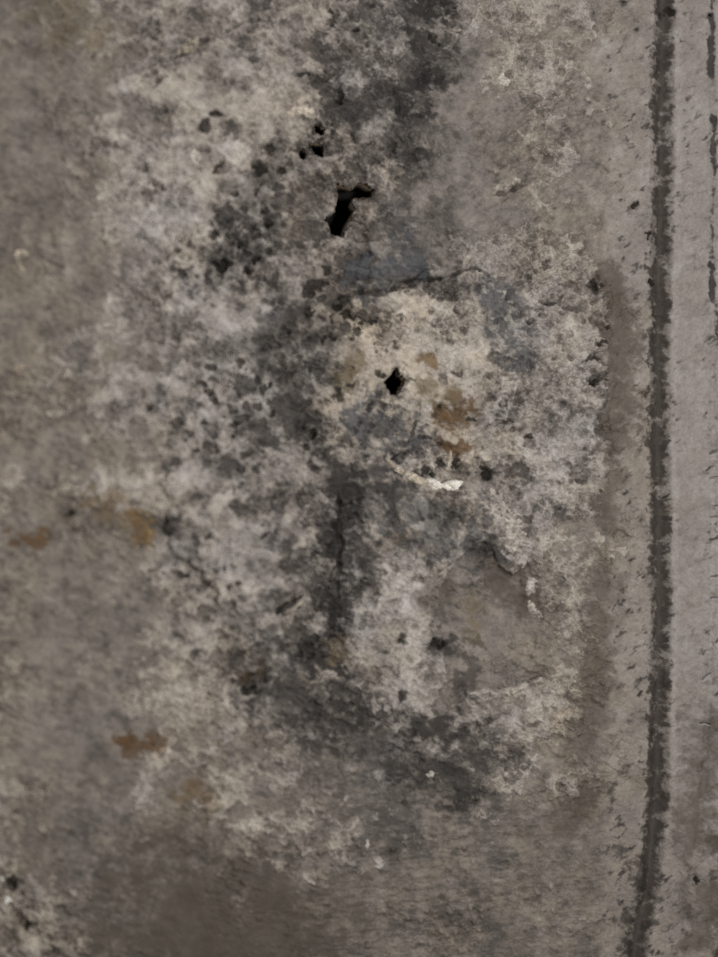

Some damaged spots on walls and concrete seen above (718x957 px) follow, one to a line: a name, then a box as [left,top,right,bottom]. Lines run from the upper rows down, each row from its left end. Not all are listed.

leakage [327,0,462,132]
peeling [189,149,202,164]
peeling [493,177,522,190]
leakage [710,114,718,176]
leakage [708,209,718,336]
leakage [590,262,644,454]
rust [48,0,627,890]
peeling [383,453,630,679]